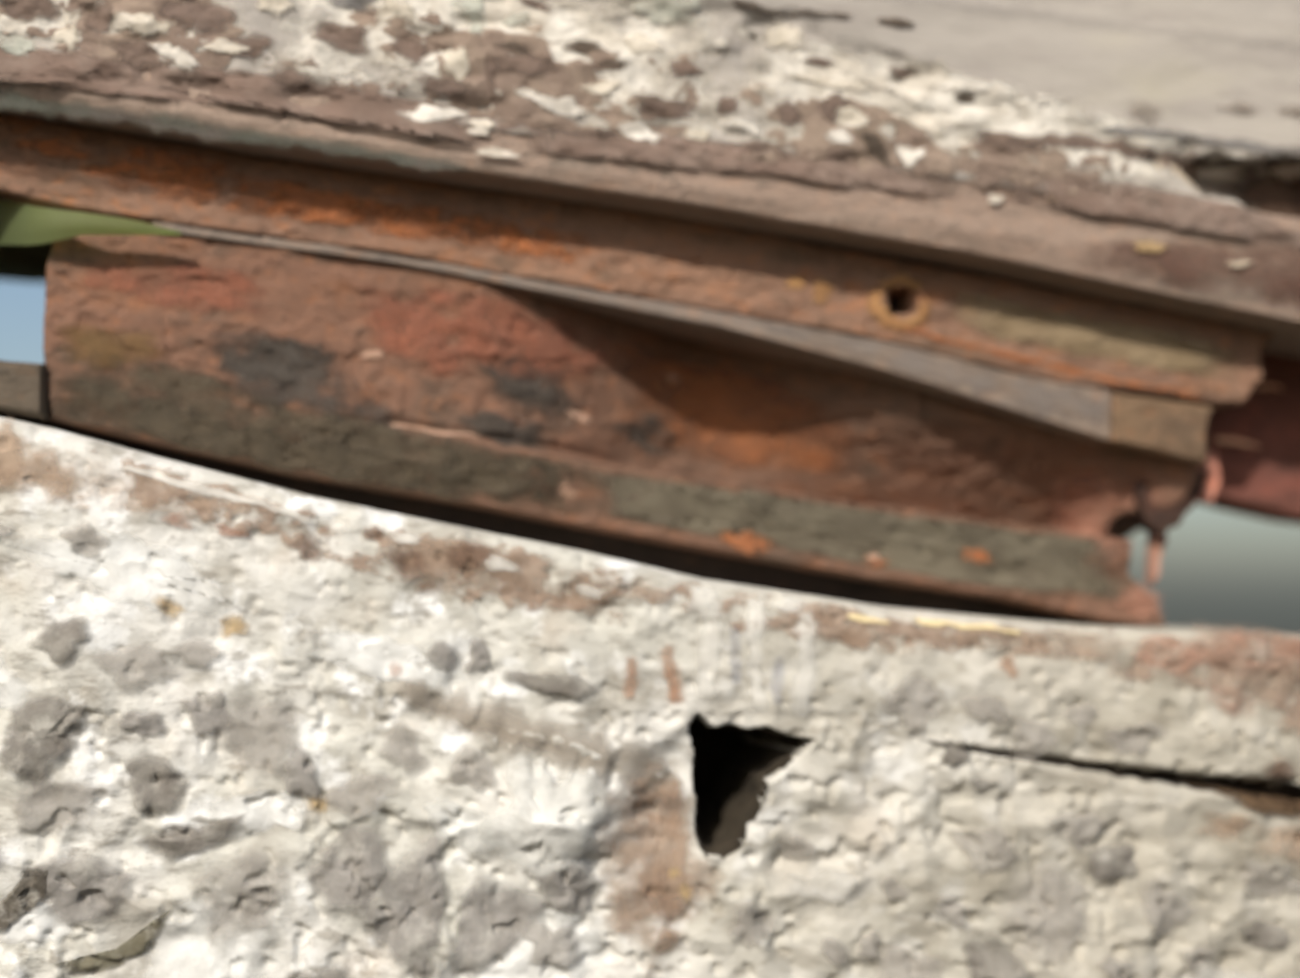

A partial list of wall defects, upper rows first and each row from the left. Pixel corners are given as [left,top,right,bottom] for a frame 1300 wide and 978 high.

peeling [0,0,1300,219]
rust [767,326,1103,421]
spalling [22,525,226,613]
spalling [31,617,88,665]
spalling [313,633,491,686]
spalling [508,671,594,700]
spalling [0,660,96,831]
spalling [942,740,969,766]
crack [925,740,1300,818]
spalling [121,692,601,978]
spalling [0,856,130,943]
spalling [64,860,283,978]